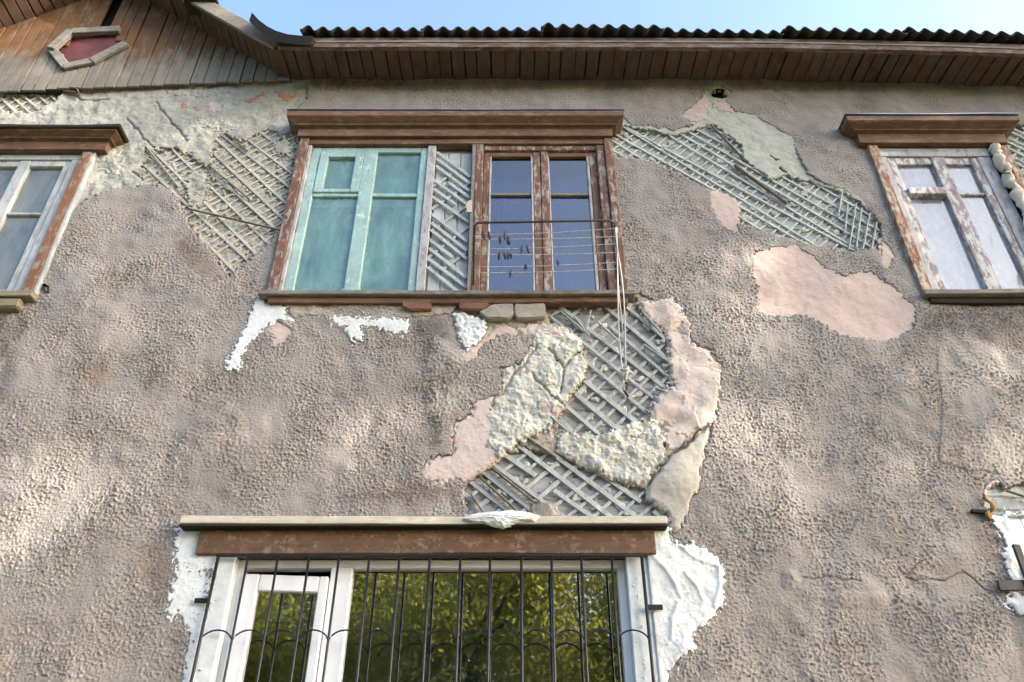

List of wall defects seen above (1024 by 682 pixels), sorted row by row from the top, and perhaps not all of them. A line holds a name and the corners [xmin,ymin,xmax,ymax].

flaking render [0,70,315,277]
flaking render [612,85,916,342]
flaking render [267,305,341,346]
flaking render [364,294,725,535]
crack [907,561,992,591]
flaking render [970,480,1024,521]